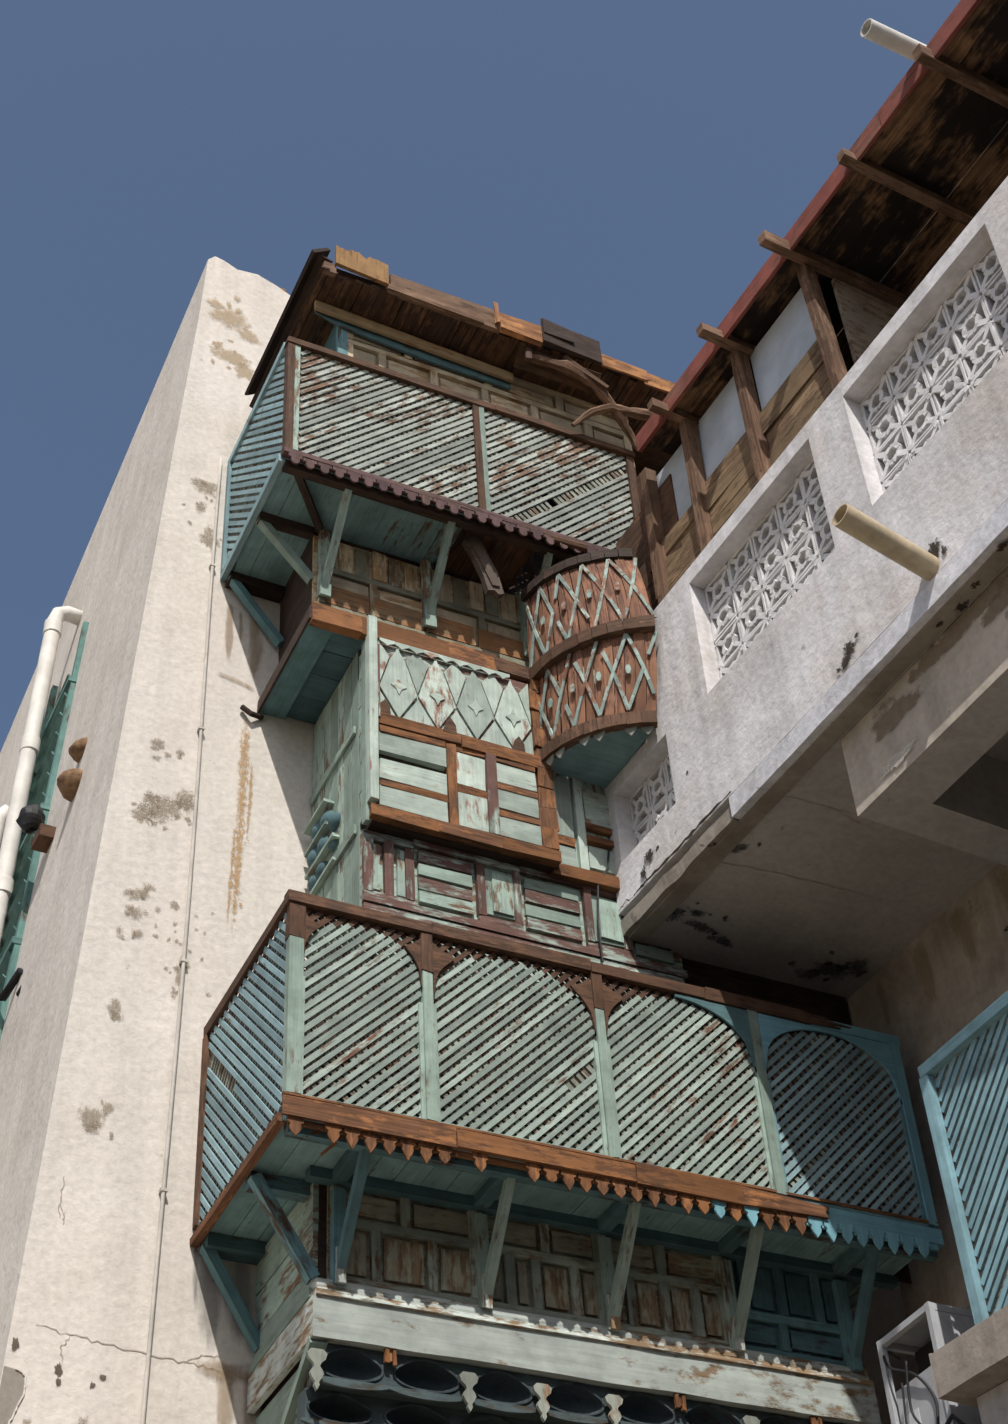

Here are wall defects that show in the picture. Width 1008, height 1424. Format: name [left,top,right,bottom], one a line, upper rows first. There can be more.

water stain [871,567,1008,742]
water stain [132,790,194,830]
corrosion [227,721,253,920]
water stain [788,951,867,982]
crack [36,1324,248,1379]
flaking render [0,1366,30,1424]